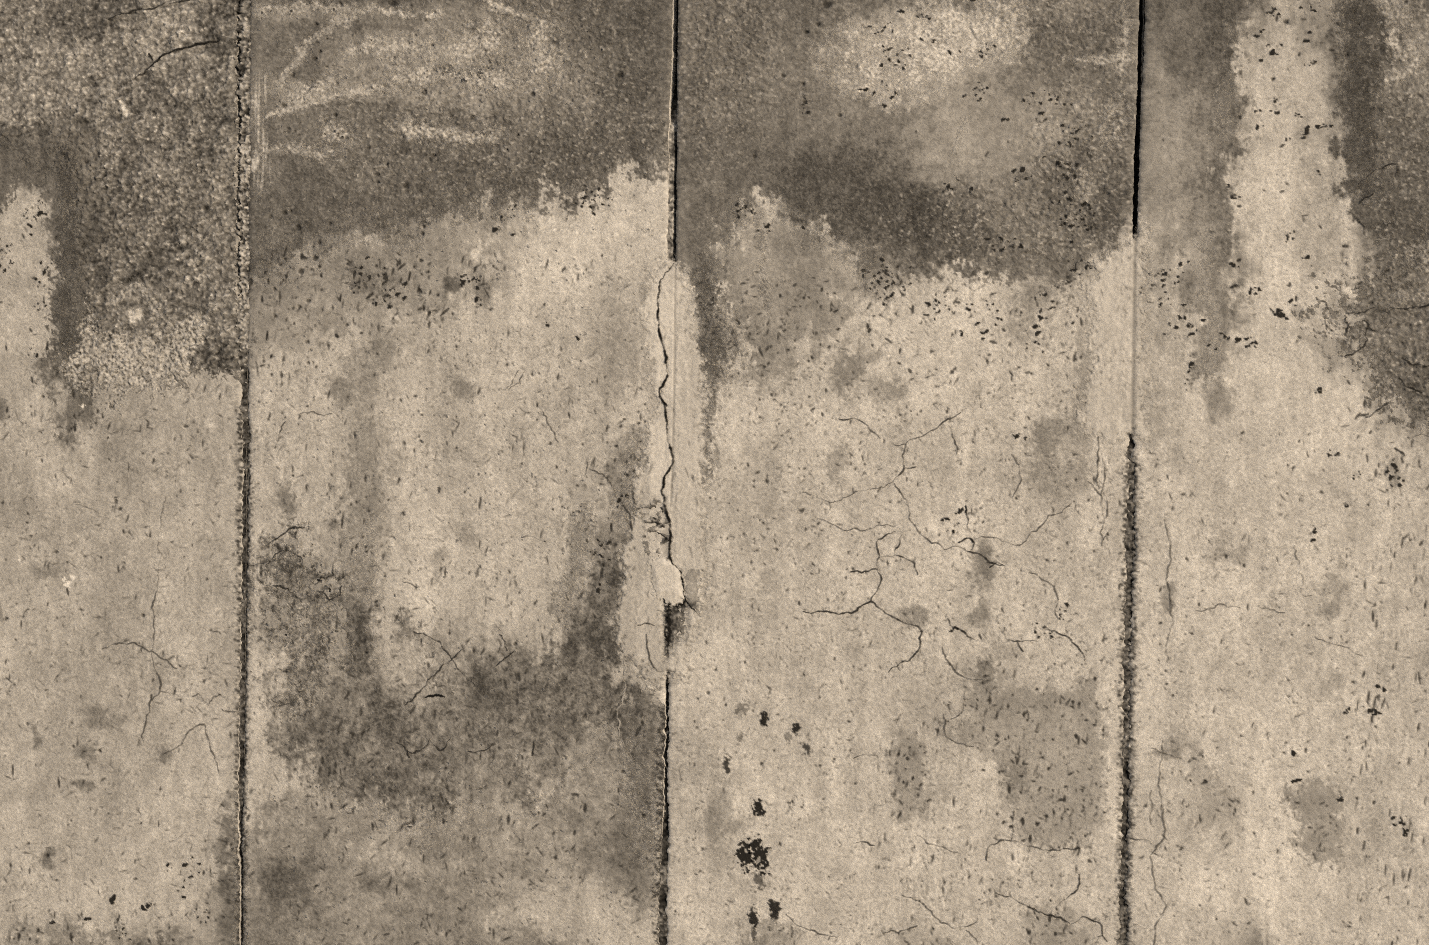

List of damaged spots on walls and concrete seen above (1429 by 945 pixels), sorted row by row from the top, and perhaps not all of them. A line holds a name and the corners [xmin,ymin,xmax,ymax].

leakage [0,134,213,405]
leakage [248,0,1269,436]
leakage [1321,0,1429,324]
leakage [248,532,303,611]
leakage [271,524,664,843]
crack [586,263,696,737]
crack [803,412,1108,747]
leakage [251,845,323,945]